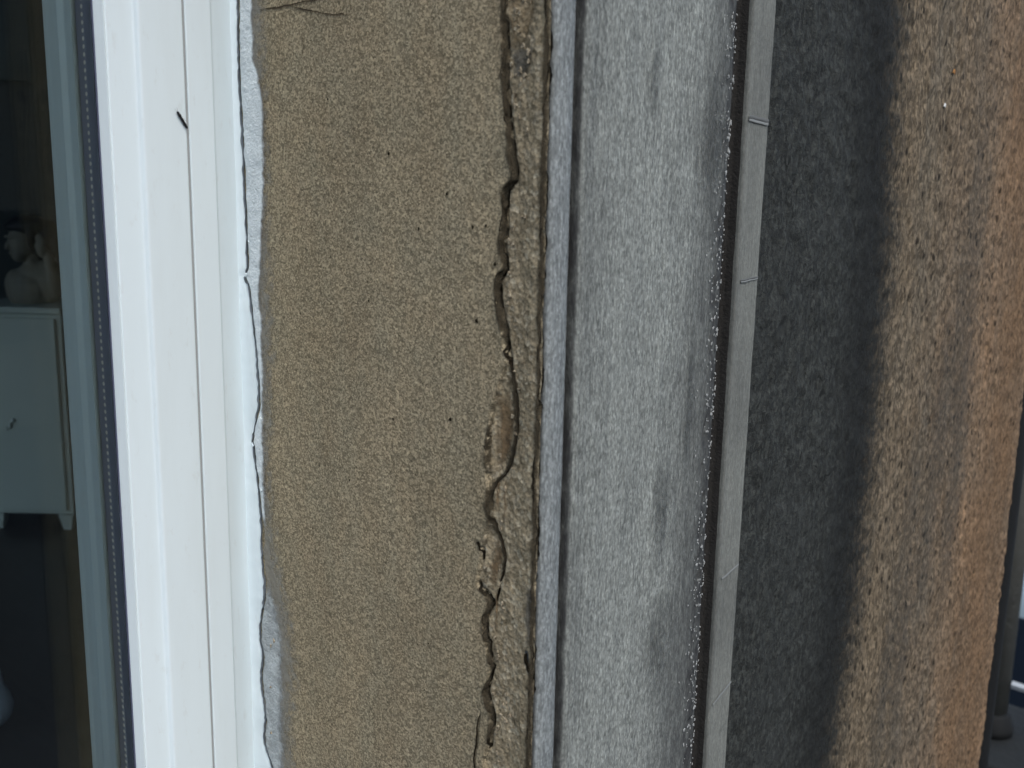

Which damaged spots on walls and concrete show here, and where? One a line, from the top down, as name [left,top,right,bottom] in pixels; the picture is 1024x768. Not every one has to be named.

crack [236,0,351,768]
crack [473,0,553,768]